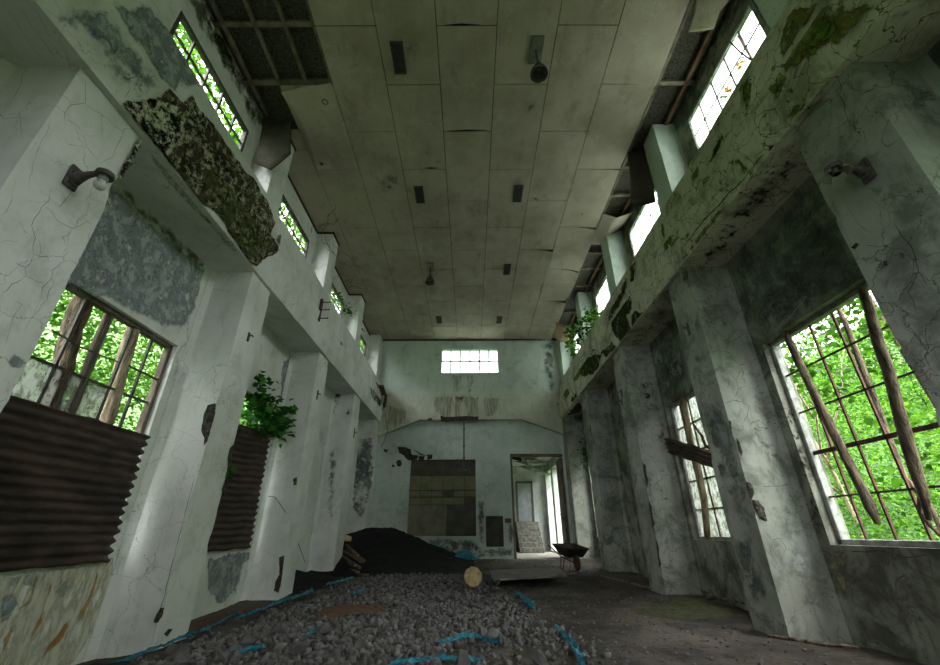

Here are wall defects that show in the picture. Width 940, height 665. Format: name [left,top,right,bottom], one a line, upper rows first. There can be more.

leakage [64,7,199,89]
crack [0,67,126,347]
spalling [119,88,279,266]
leakage [706,153,796,259]
crack [842,197,935,413]
spalling [201,403,216,446]
leakage [353,438,374,516]
peeling [384,447,432,467]
peeling [2,572,74,621]
spalling [274,555,284,592]